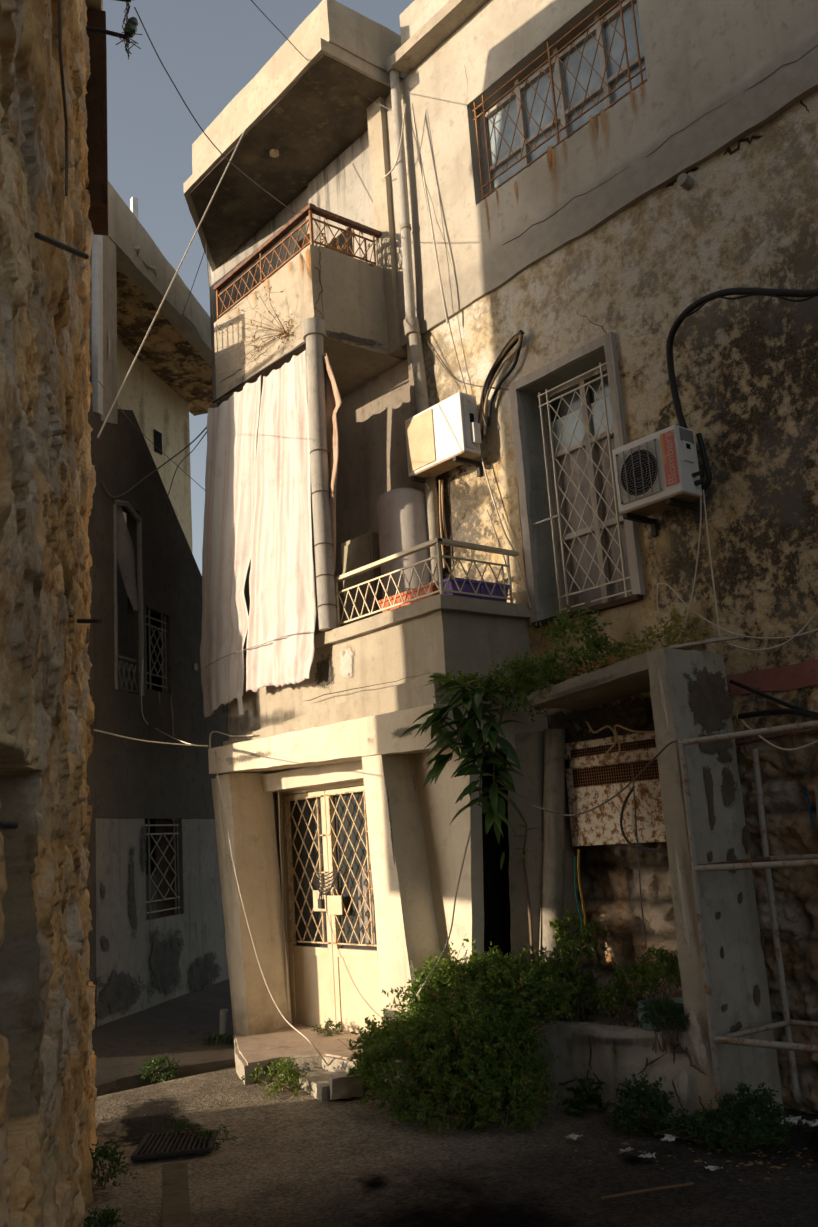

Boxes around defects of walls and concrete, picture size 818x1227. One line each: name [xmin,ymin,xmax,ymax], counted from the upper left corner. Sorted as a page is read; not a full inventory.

crack [501,45,817,246]
rust [288,249,310,274]
peeling [683,661,738,831]
leakage [94,925,222,1021]